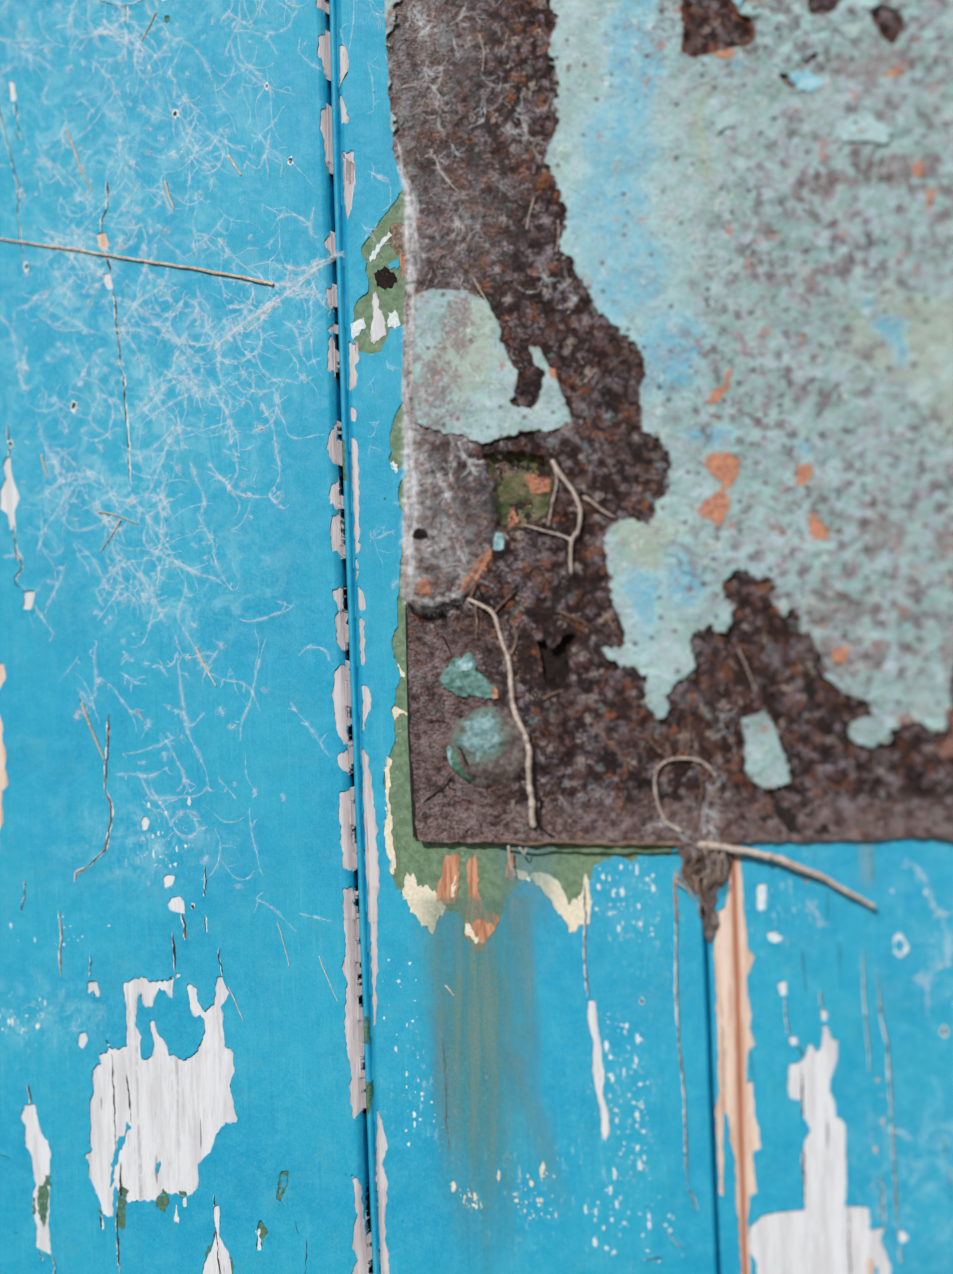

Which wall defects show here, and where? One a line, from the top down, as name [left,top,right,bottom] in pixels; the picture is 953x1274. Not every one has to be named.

peeling [316,0,356,218]
peeling [789,68,825,93]
peeling [834,110,893,145]
peeling [324,231,336,260]
peeling [326,190,411,391]
corrosion [386,0,953,844]
peeling [0,717,8,827]
peeling [326,403,674,1274]
peeling [21,1104,52,1255]
peeling [78,1033,88,1049]
peeling [85,973,237,1230]
peeling [714,842,909,1274]